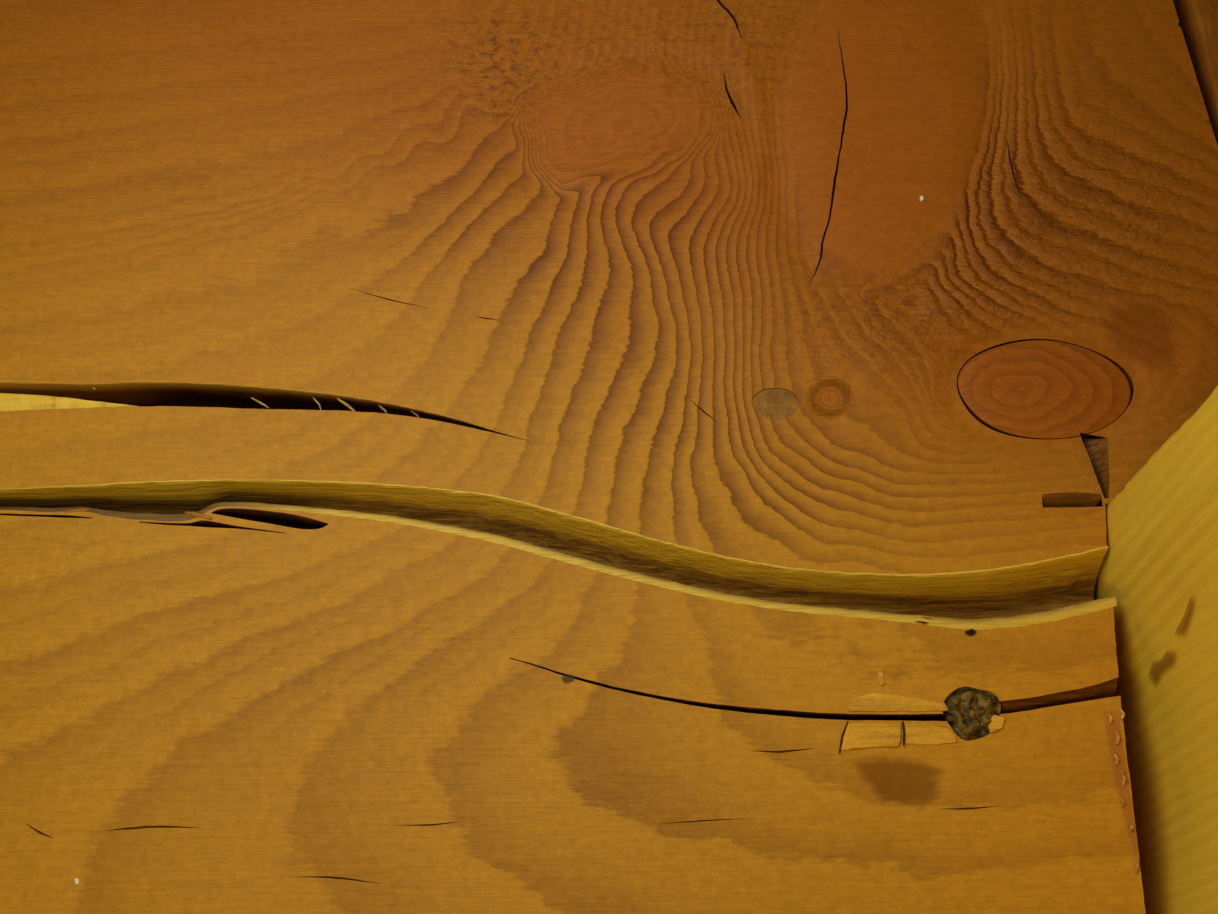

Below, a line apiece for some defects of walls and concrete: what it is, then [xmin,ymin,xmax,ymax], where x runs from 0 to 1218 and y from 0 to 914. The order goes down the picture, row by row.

crack [808,33,848,285]
crack [0,380,528,441]
crack [0,479,1117,630]
crack [510,657,955,722]
crack [993,677,1119,715]
crack [749,746,814,754]
water stain [863,763,930,798]